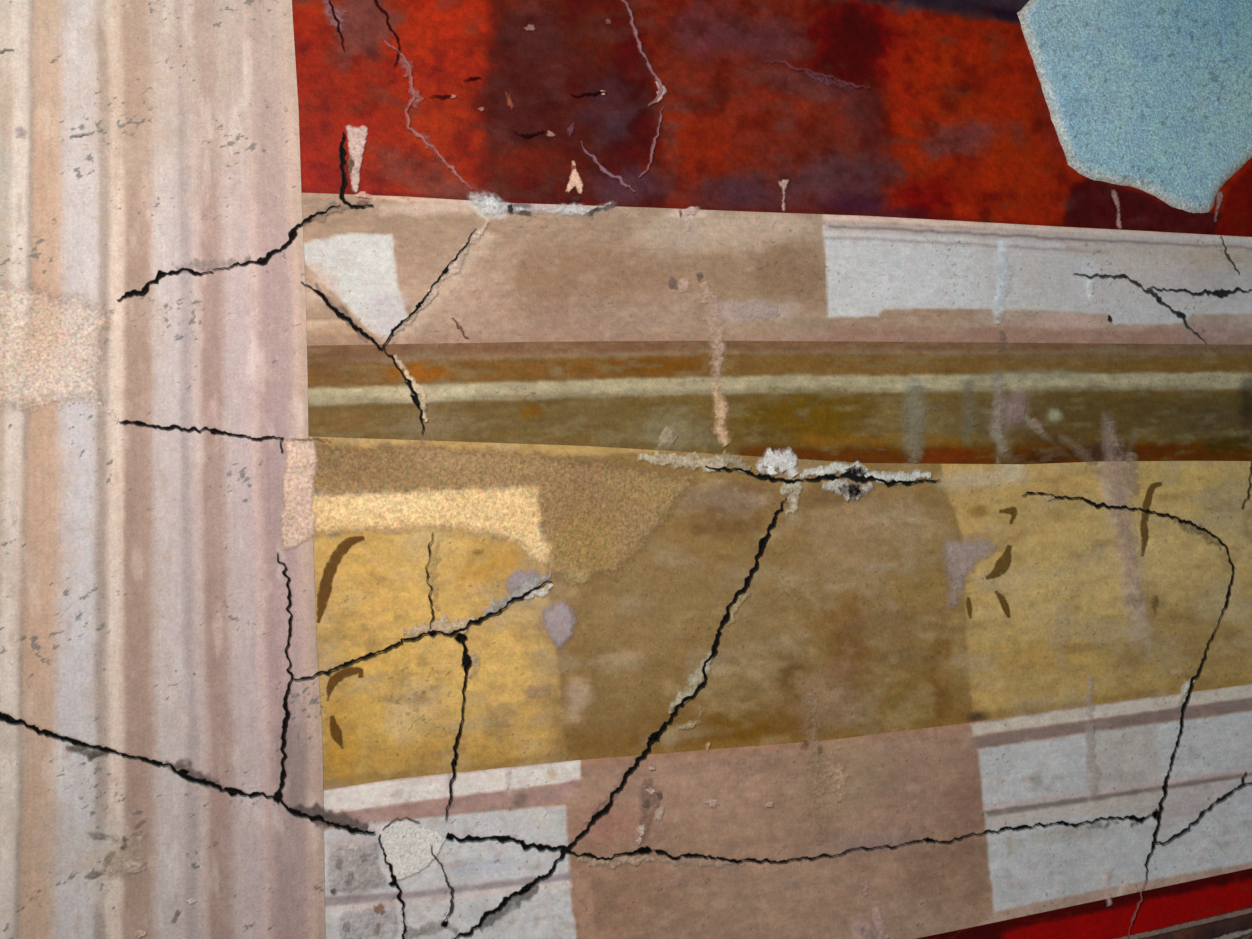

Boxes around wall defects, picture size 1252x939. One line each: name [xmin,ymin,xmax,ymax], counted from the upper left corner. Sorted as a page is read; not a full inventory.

crack [323,0,346,51]
crack [374,0,666,192]
crack [117,132,373,301]
crack [301,220,489,434]
flaking render [1112,190,1121,229]
crack [1073,236,1252,344]
crack [98,401,329,453]
crack [0,448,1252,939]